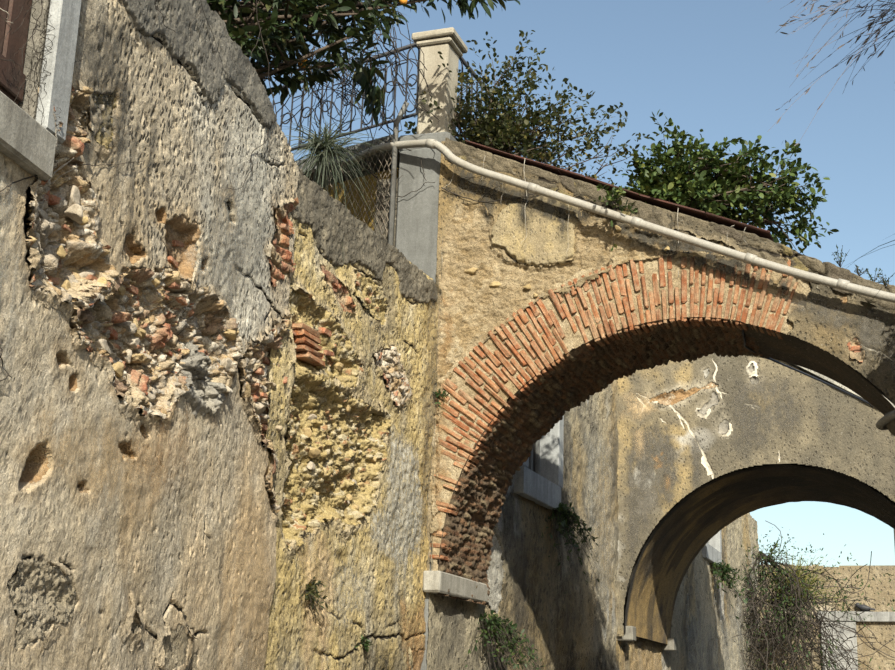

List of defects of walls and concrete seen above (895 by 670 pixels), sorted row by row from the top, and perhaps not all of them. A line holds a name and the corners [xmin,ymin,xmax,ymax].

spalling [24,80,745,561]
flaking render [746,361,759,384]
spalling [18,442,49,492]
spalling [8,555,78,652]
spalling [120,590,144,651]
spalling [153,624,198,670]
crack [313,611,423,660]